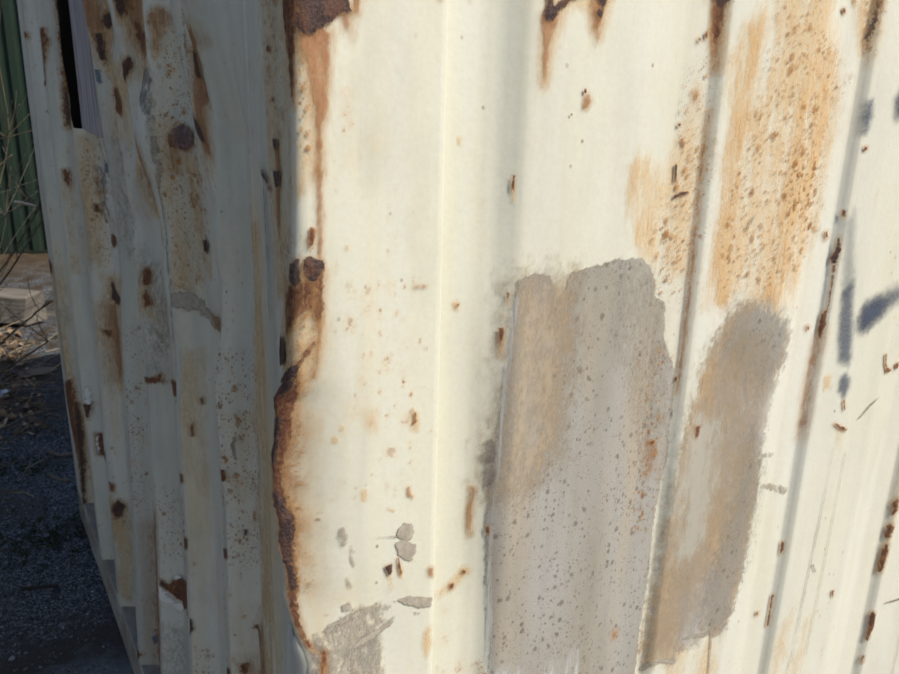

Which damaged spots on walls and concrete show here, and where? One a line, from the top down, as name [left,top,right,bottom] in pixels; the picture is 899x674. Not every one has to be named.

corrosion [40,0,71,129]
corrosion [842,0,884,50]
corrosion [82,0,211,288]
corrosion [648,0,730,392]
corrosion [715,0,850,311]
corrosion [102,277,124,389]
corrosion [215,0,360,648]
corrosion [800,231,842,426]
corrosion [65,380,87,504]
corrosion [109,482,126,519]
corrosion [877,499,899,572]
corrosion [866,612,876,641]